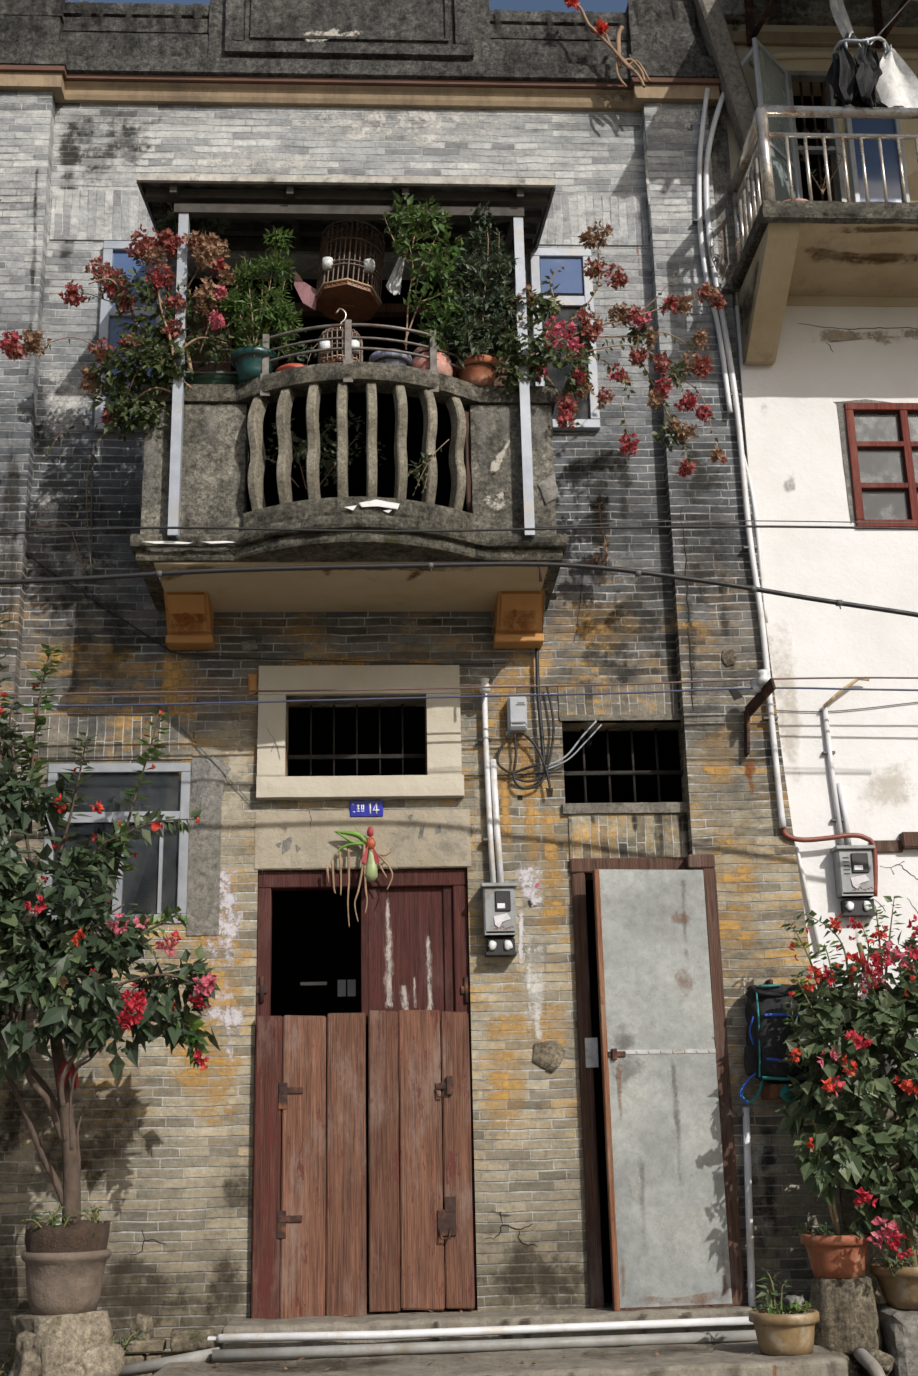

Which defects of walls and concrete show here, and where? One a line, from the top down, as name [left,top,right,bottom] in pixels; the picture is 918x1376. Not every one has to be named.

peeling [304,28,360,42]
damp [306,110,508,145]
damp [59,114,160,189]
damp [162,149,317,169]
peeling [822,330,918,342]
damp [563,449,632,565]
damp [675,451,734,634]
damp [574,577,705,684]
crack [483,1212,538,1248]